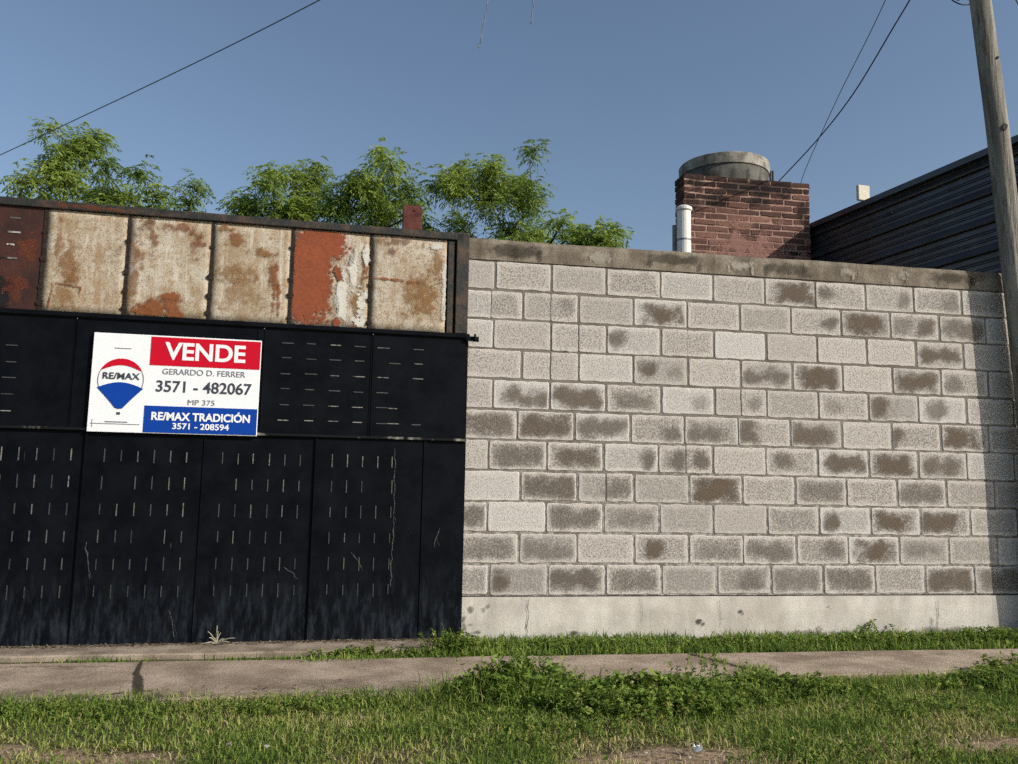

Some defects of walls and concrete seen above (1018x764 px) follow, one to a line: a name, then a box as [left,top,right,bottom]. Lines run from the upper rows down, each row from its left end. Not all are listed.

corrosion [219,224,244,247]
corrosion [47,235,81,309]
corrosion [128,218,206,318]
corrosion [257,230,352,326]
peeling [333,245,371,328]
corrosion [351,252,443,327]
water stain [765,264,831,305]
water stain [802,366,838,390]
water stain [896,347,962,393]
water stain [506,384,628,437]
water stain [824,428,914,476]
water stain [856,511,911,563]